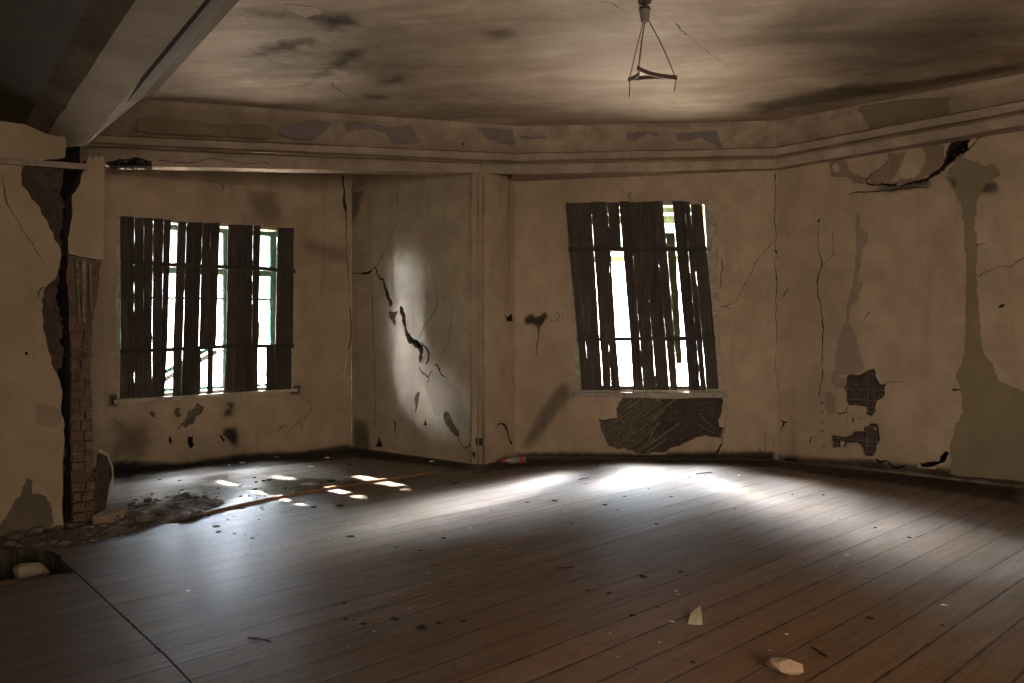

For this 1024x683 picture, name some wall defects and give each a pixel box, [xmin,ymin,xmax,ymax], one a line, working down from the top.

crack [837,137,981,194]
crack [2,146,80,416]
crack [342,175,452,383]
crack [809,216,861,447]
flaking render [825,140,1024,482]
spalling [169,403,205,449]
spalling [598,398,724,454]
flaking render [0,478,54,536]
crack [60,443,68,516]